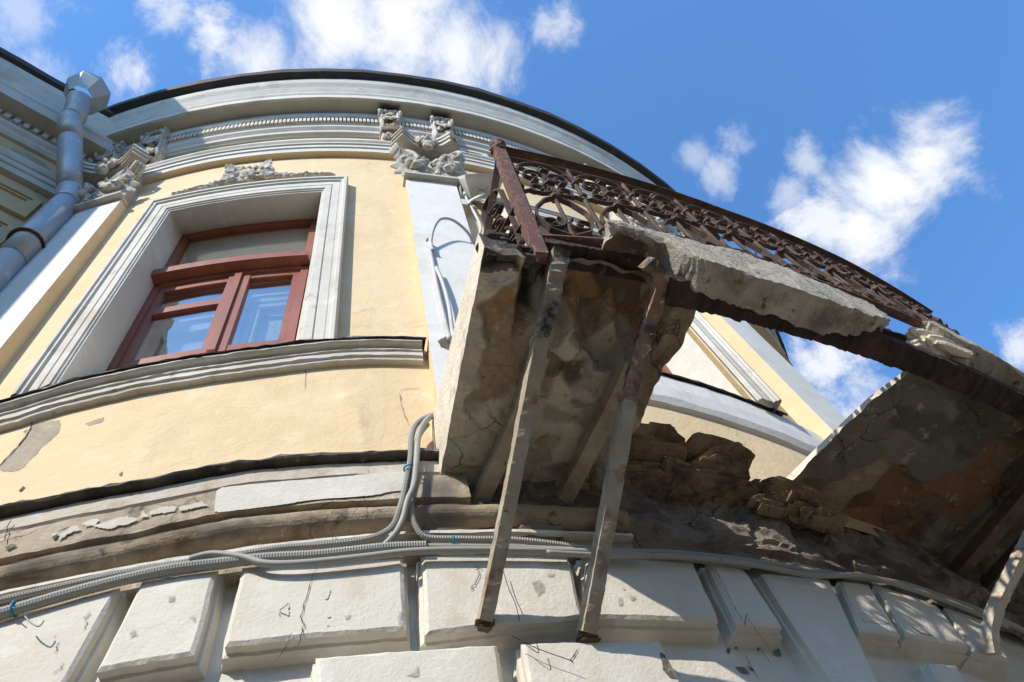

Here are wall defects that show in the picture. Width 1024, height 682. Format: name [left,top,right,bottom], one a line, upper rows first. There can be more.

spalling [475,232,541,283]
spalling [604,220,891,336]
peeling [0,420,61,472]
peeling [51,471,417,540]
flaking render [469,484,504,505]
flaking render [509,523,565,545]
flaking render [518,480,602,508]
flaking render [615,422,991,621]
crack [276,566,317,660]
flaking render [1000,590,1024,640]